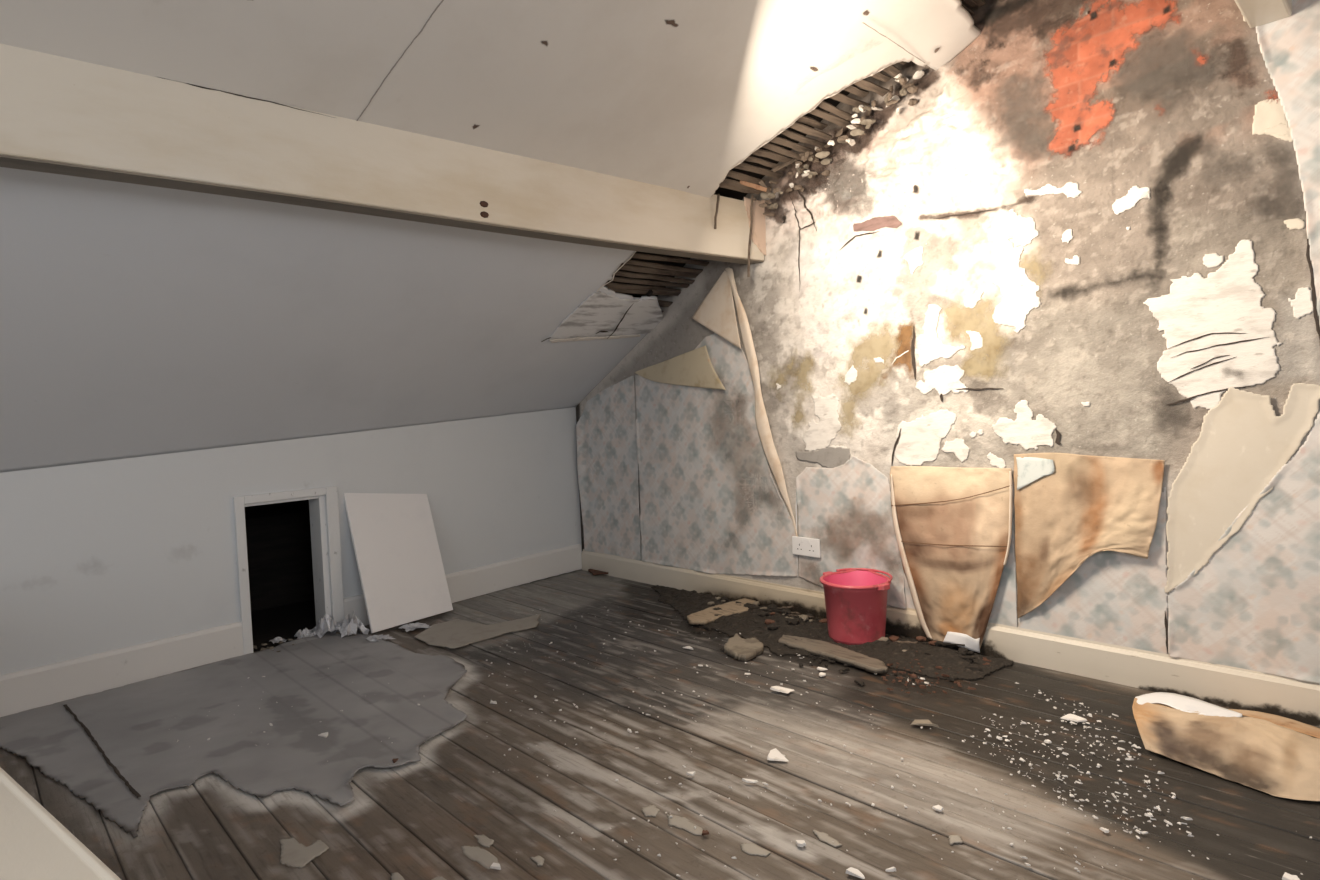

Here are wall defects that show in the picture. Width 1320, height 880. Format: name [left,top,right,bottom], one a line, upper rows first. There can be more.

water stain [1001,77,1050,157]
flaking render [1043,0,1181,157]
water stain [1119,33,1255,99]
peeling [1252,92,1293,142]
water stain [1149,138,1209,258]
water stain [841,327,901,427]
water stain [945,301,1004,377]
peeling [894,304,1056,468]
peeling [964,209,1041,333]
water stain [1055,287,1086,298]
peeling [1143,239,1282,409]
peeling [1288,287,1313,319]